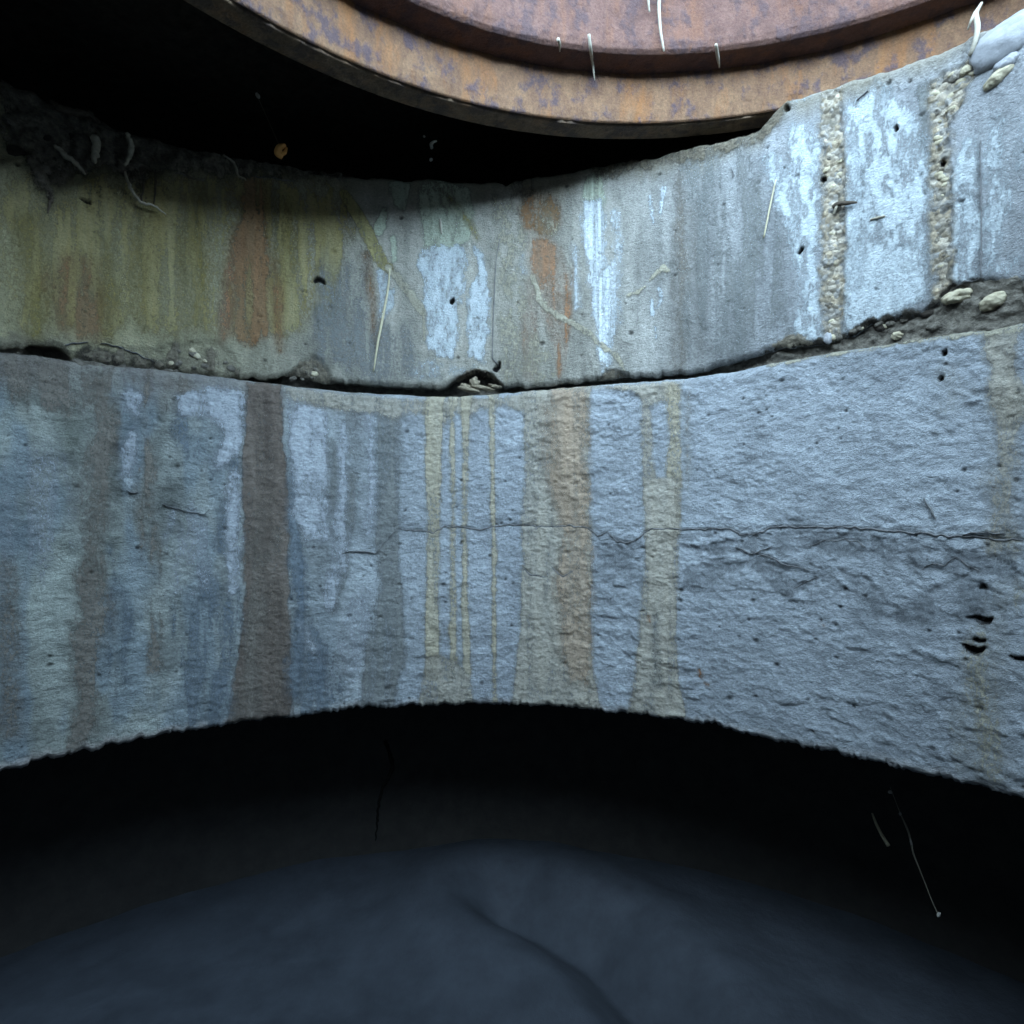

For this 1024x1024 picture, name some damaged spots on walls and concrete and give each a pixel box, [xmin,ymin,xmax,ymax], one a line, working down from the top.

water stain [0,353,143,418]
water stain [120,430,138,489]
water stain [169,386,246,729]
water stain [283,100,824,718]
rust [512,192,602,710]
crack [342,524,1022,589]
water stain [822,81,1024,558]